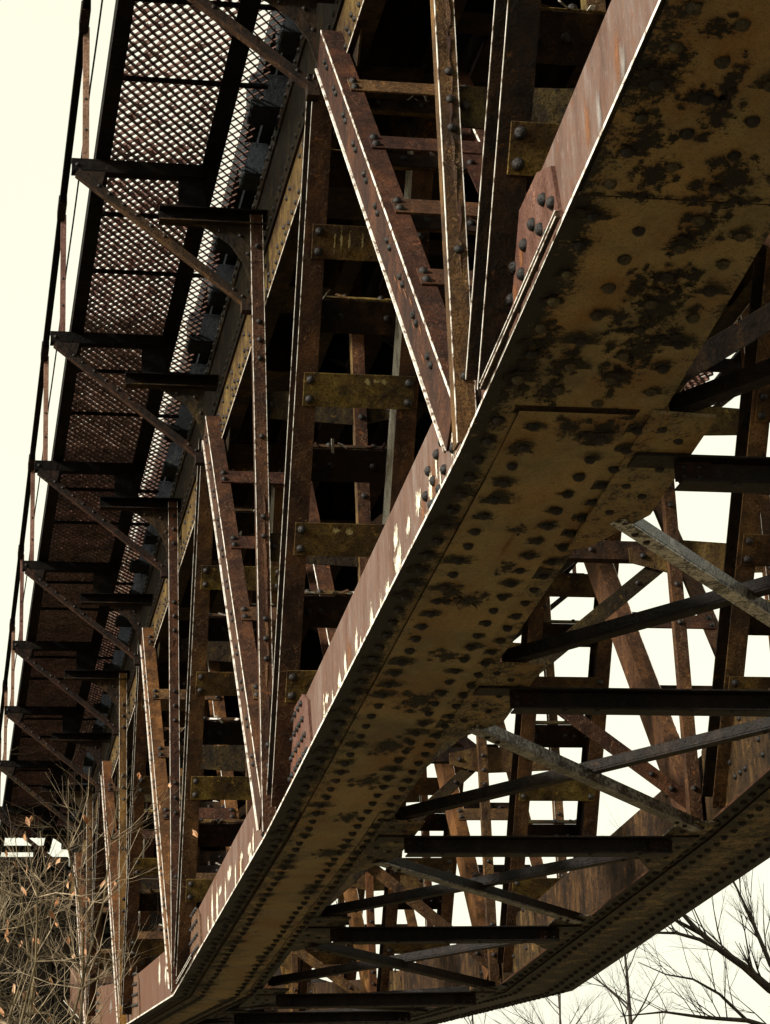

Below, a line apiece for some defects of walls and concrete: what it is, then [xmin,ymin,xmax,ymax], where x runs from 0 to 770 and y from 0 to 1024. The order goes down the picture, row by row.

peeling [370,460,442,625]
peeling [207,833,254,932]